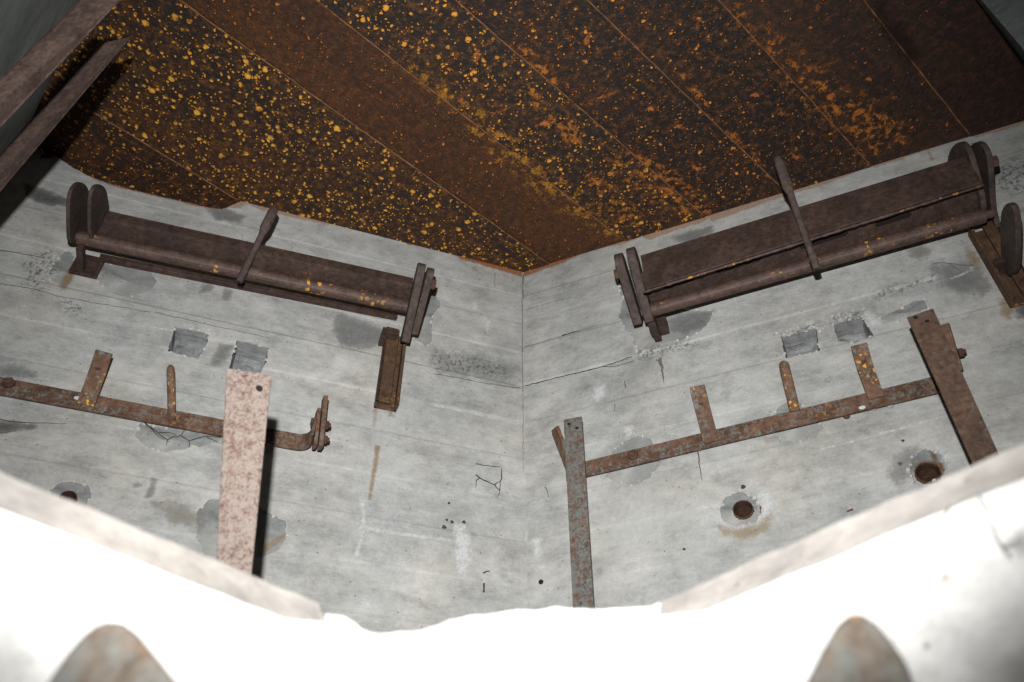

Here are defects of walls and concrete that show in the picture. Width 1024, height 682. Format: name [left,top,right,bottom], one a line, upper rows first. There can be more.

corrosion [518,47,557,84]
corrosion [758,29,933,167]
corrosion [408,64,854,246]
water stain [336,318,381,346]
spalling [775,298,929,356]
crack [144,422,221,446]
spalling [612,435,653,455]
spalling [50,480,93,506]
crack [476,463,502,498]
spalling [607,460,661,487]
spalling [717,485,765,529]
spalling [898,446,948,486]